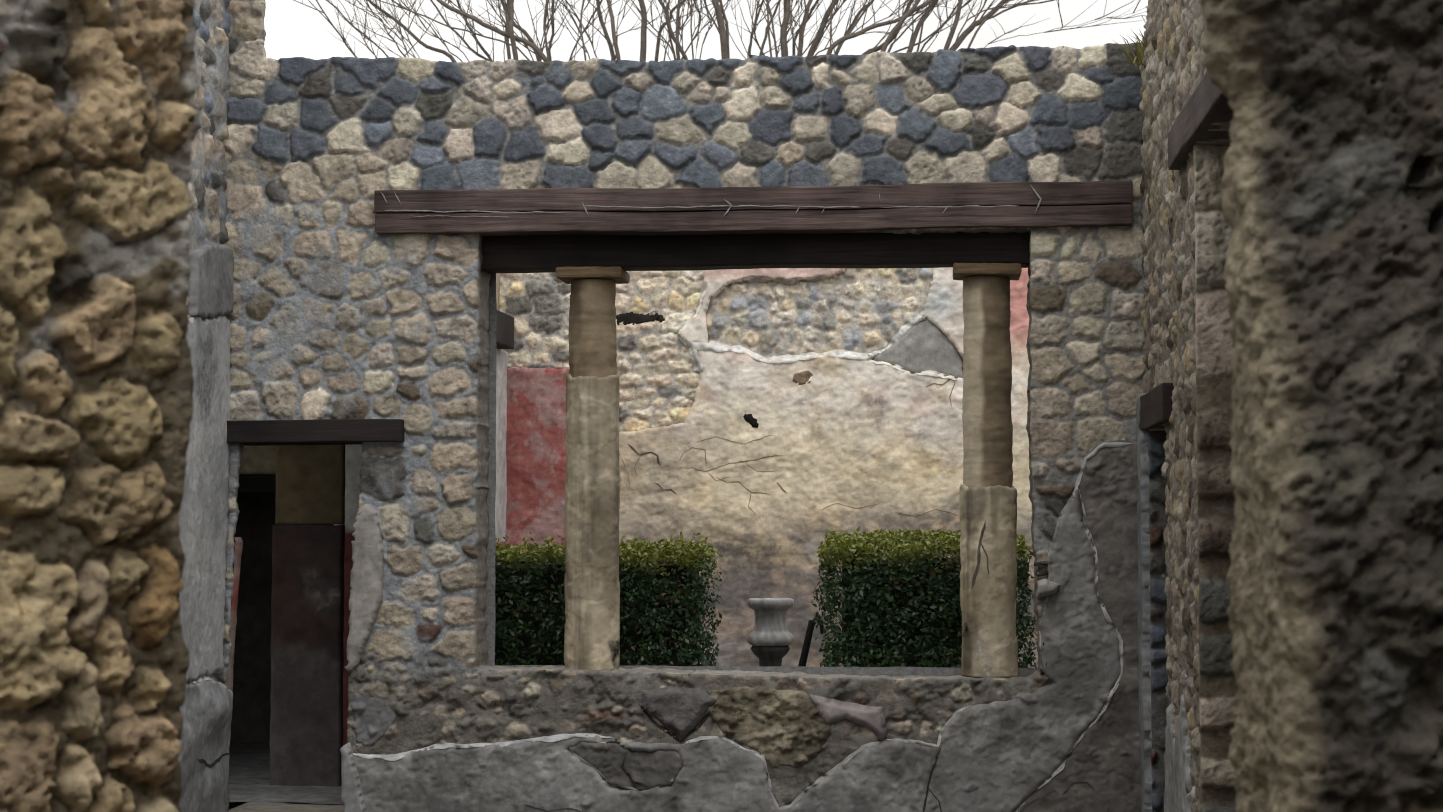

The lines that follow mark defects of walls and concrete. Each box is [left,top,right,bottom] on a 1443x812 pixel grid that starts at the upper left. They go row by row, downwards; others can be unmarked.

peeling [499,272,571,369]
peeling [615,268,963,432]
crack [622,435,787,514]
crack [822,503,989,589]
crack [1020,782,1095,812]